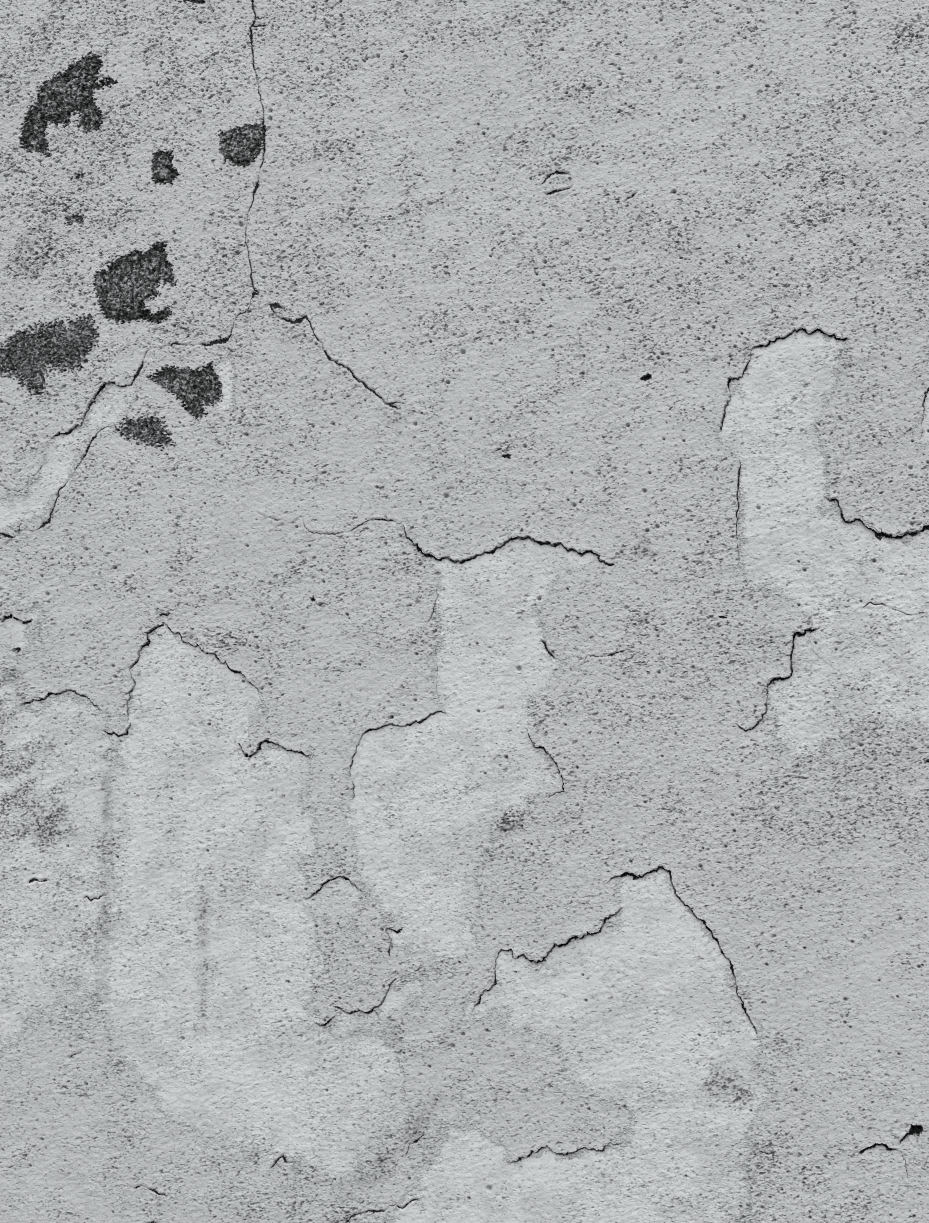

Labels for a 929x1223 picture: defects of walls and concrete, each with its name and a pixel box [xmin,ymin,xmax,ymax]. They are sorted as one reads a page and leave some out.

crack [131,0,401,410]
flaking render [709,321,929,766]
flaking render [0,518,614,1186]
flaking render [374,859,776,1223]